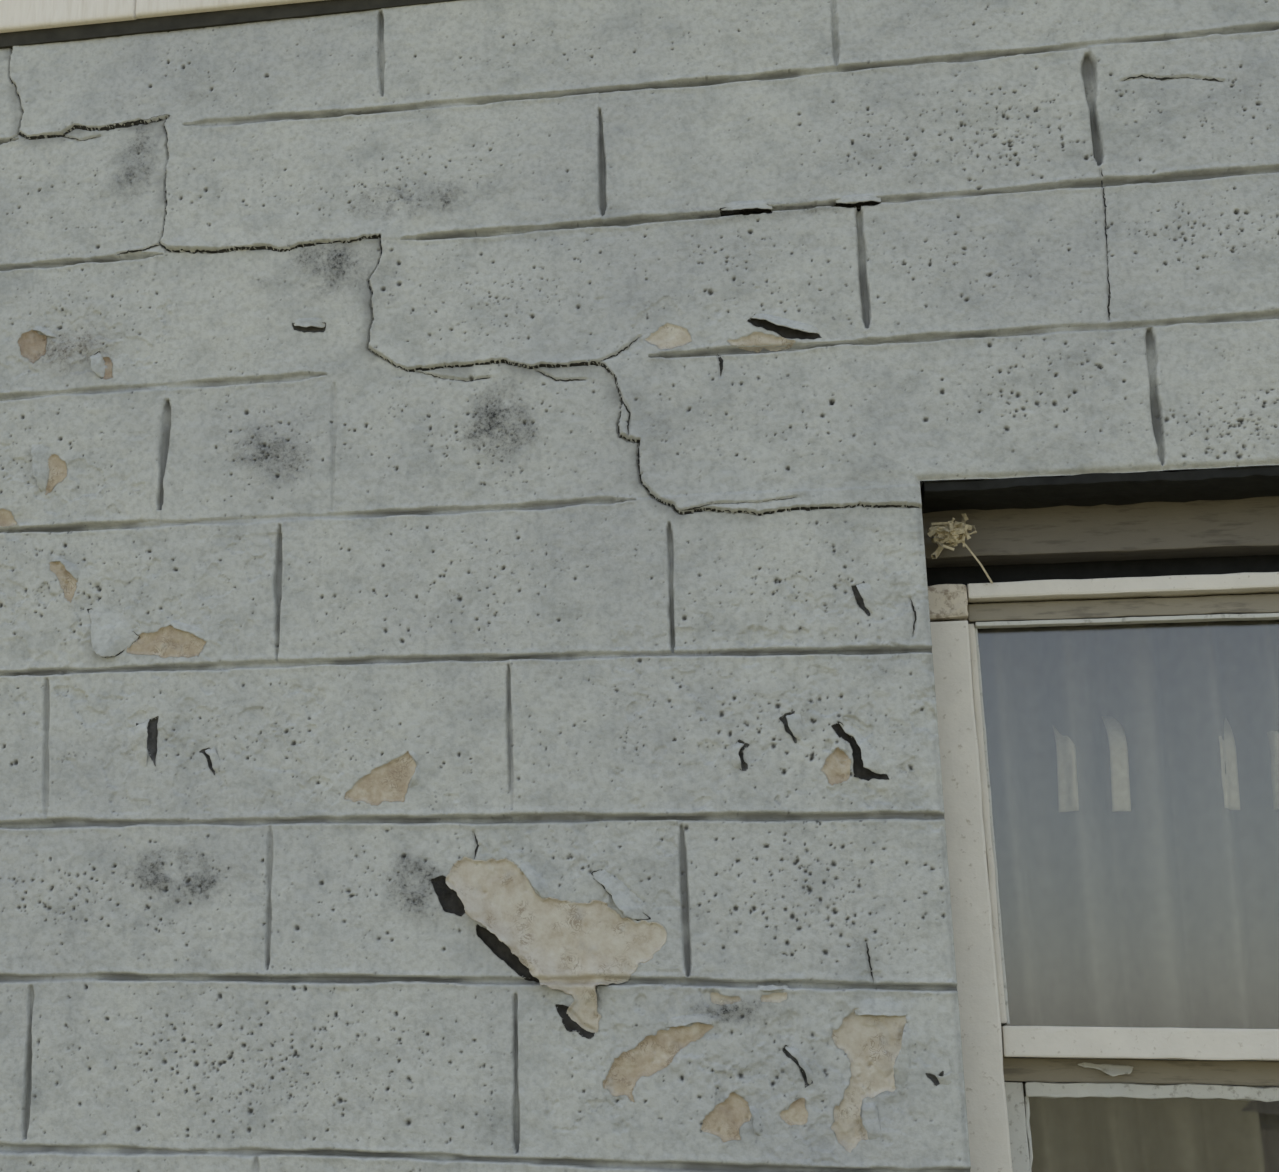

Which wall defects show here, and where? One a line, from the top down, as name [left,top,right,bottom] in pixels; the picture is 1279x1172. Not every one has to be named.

crack [10,49,920,516]
peeling [18,326,57,363]
peeling [90,351,113,379]
peeling [727,313,822,353]
peeling [50,552,79,603]
peeling [87,607,206,658]
peeling [345,751,421,806]
peeling [821,717,889,785]
peeling [430,857,667,1039]
peeling [603,992,741,1102]
peeling [831,998,912,1153]
peeling [701,1092,764,1142]